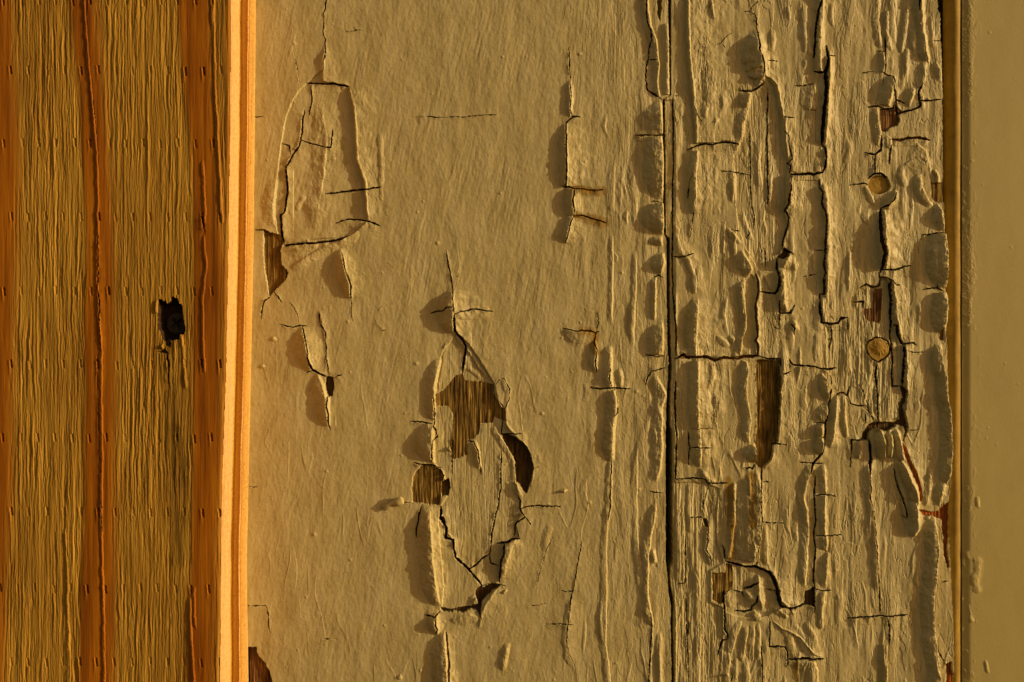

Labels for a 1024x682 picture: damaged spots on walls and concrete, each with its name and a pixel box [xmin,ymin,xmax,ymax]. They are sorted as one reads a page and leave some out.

peeling [257,0,391,313]
crack [687,135,739,150]
peeling [282,311,341,429]
crack [674,348,755,370]
peeling [640,0,953,682]
peeling [383,254,559,636]
crack [676,466,726,484]
crack [848,484,907,682]
peeling [248,647,273,682]
crack [760,615,825,682]